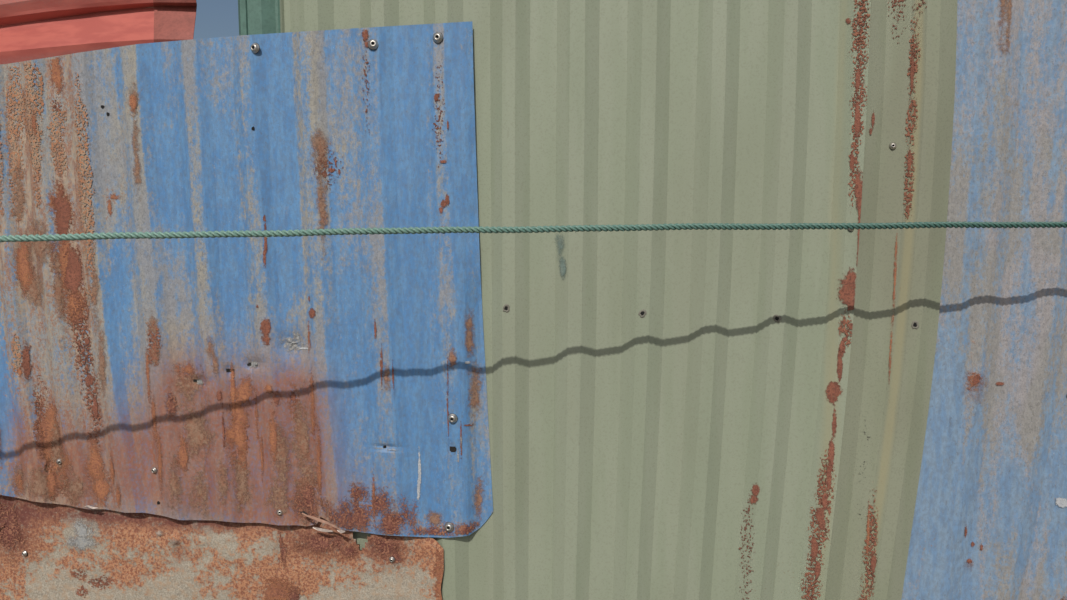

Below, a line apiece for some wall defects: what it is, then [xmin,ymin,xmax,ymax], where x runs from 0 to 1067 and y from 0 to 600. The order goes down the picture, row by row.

corrosion [846,0,875,265]
corrosion [888,0,927,219]
corrosion [0,57,483,600]
corrosion [889,238,897,380]
corrosion [968,372,981,390]
corrosion [738,485,760,599]
corrosion [801,449,836,600]
corrosion [858,490,879,600]